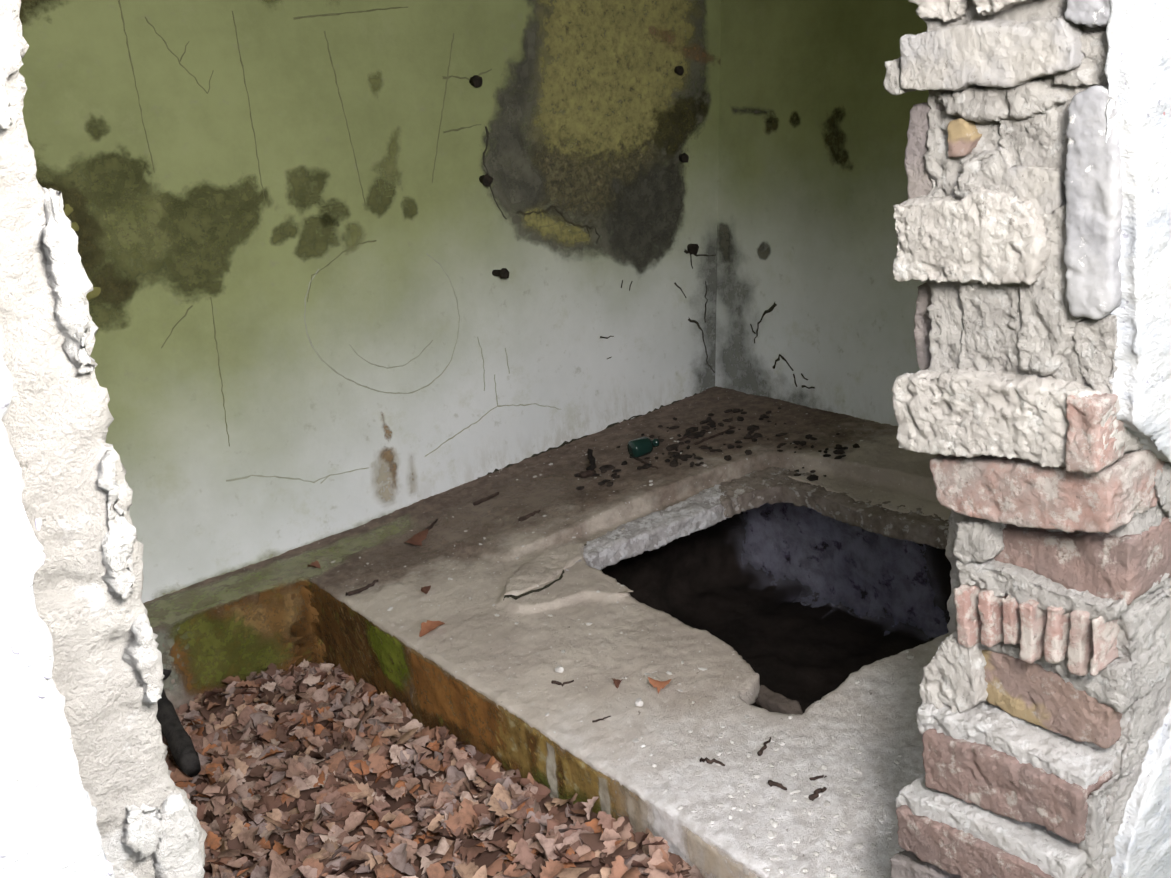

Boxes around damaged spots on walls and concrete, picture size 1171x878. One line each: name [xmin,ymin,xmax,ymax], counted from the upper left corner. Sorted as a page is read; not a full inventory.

mould [86,117,107,140]
mould [36,154,270,330]
mould [272,166,362,260]
mould [367,132,417,218]
damp [482,0,713,272]
damp [733,108,800,133]
damp [696,224,807,406]
crack [503,570,564,600]